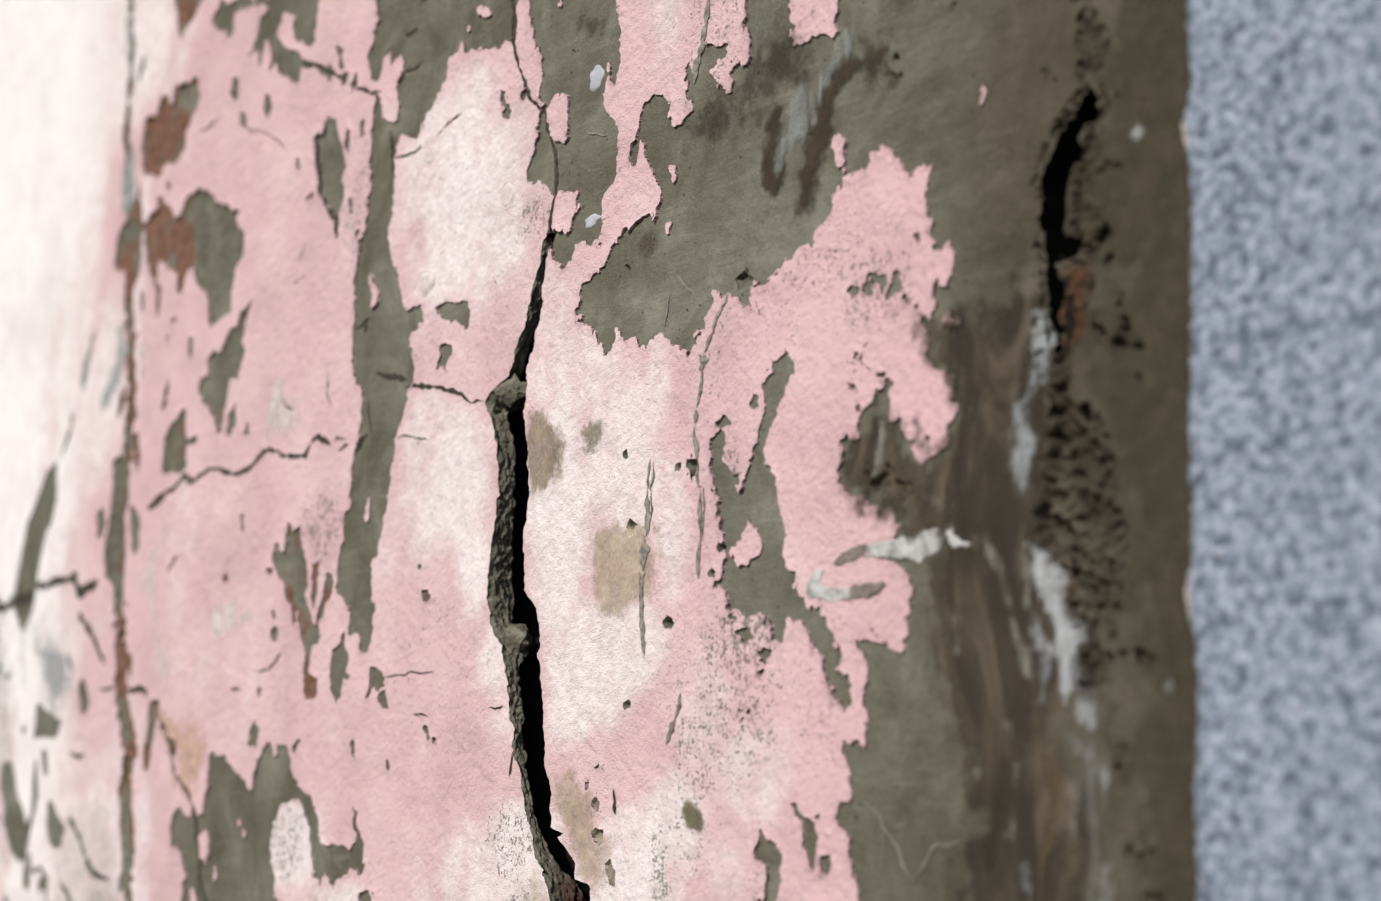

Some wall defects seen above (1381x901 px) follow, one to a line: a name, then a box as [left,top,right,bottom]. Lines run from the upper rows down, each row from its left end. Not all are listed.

crack [0,571,206,901]
spalling [86,0,250,901]
peeling [171,722,371,901]
crack [148,0,590,901]
peeling [214,0,1198,901]
water stain [843,0,1199,901]